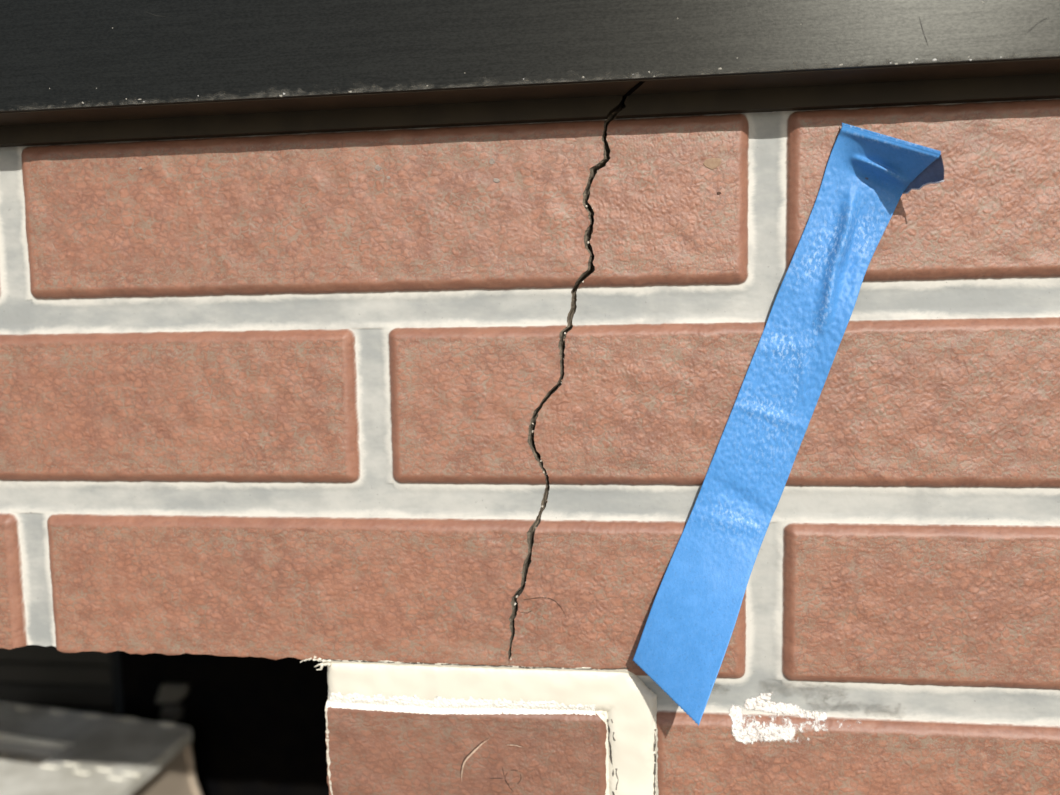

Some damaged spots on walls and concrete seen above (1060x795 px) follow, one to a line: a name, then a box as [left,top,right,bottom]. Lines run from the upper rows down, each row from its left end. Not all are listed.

crack [321,82,644,670]